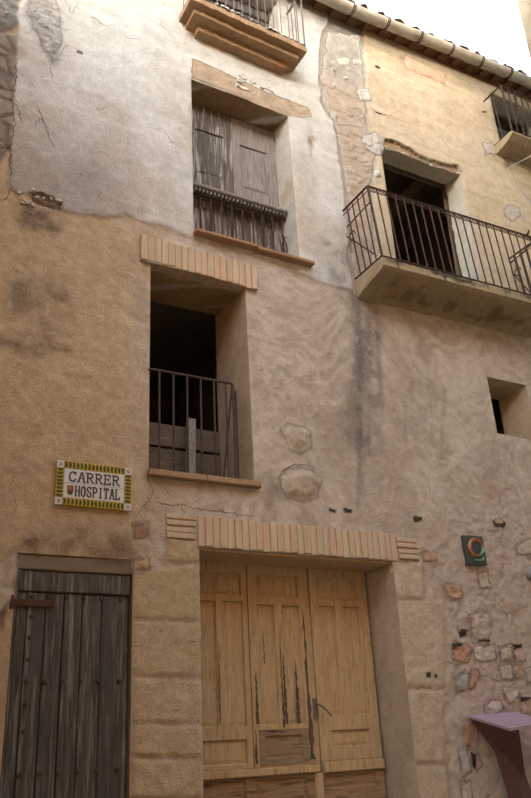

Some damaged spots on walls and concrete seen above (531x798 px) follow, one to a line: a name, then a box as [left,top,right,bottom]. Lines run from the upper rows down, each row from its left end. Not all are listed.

peeling [27,0,62,62]
crack [0,57,55,201]
spalling [320,32,387,281]
crack [136,472,253,518]